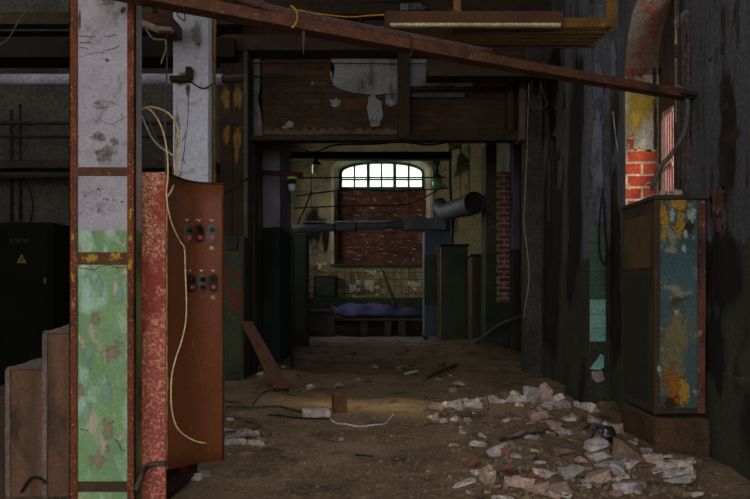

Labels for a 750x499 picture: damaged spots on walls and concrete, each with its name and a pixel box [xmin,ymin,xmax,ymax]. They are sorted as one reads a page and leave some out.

crack [78,34,120,57]
corrosion [221,86,243,111]
peeling [254,59,398,136]
leakage [93,133,118,161]
spalling [626,135,657,205]
leakage [544,78,584,360]
peeling [349,279,380,293]